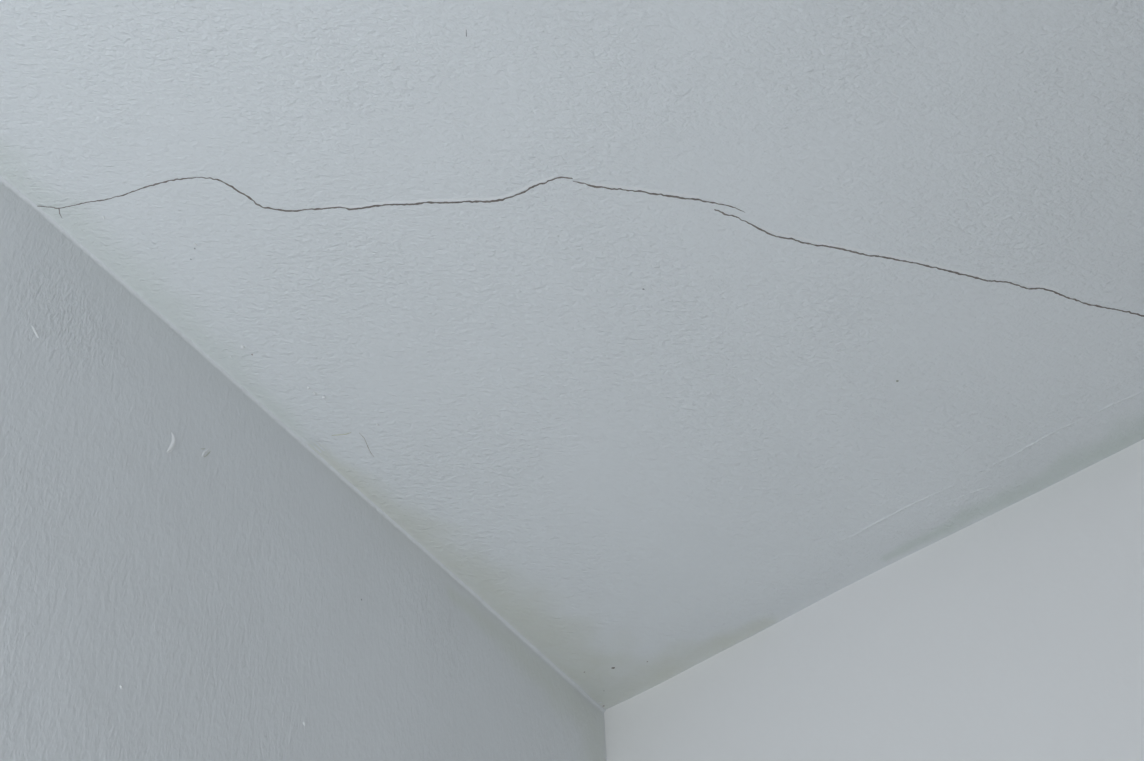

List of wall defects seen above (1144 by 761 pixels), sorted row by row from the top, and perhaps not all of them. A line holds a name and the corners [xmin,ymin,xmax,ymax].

crack [38,175,1144,317]